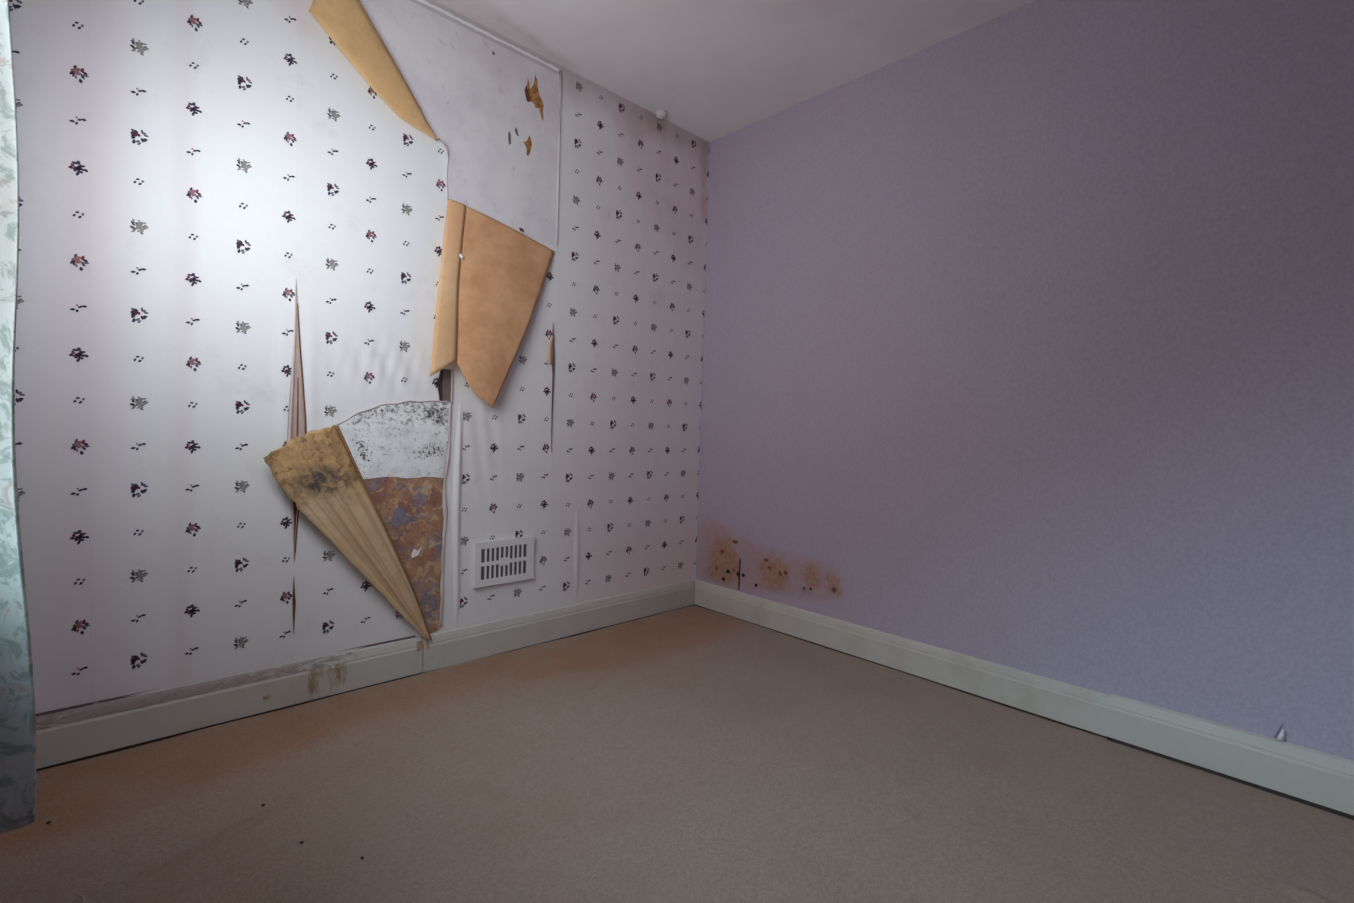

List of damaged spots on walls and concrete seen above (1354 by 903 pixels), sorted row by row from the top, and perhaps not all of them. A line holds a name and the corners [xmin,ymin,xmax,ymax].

peeling [416,0,559,121]
leakage [715,540,758,590]